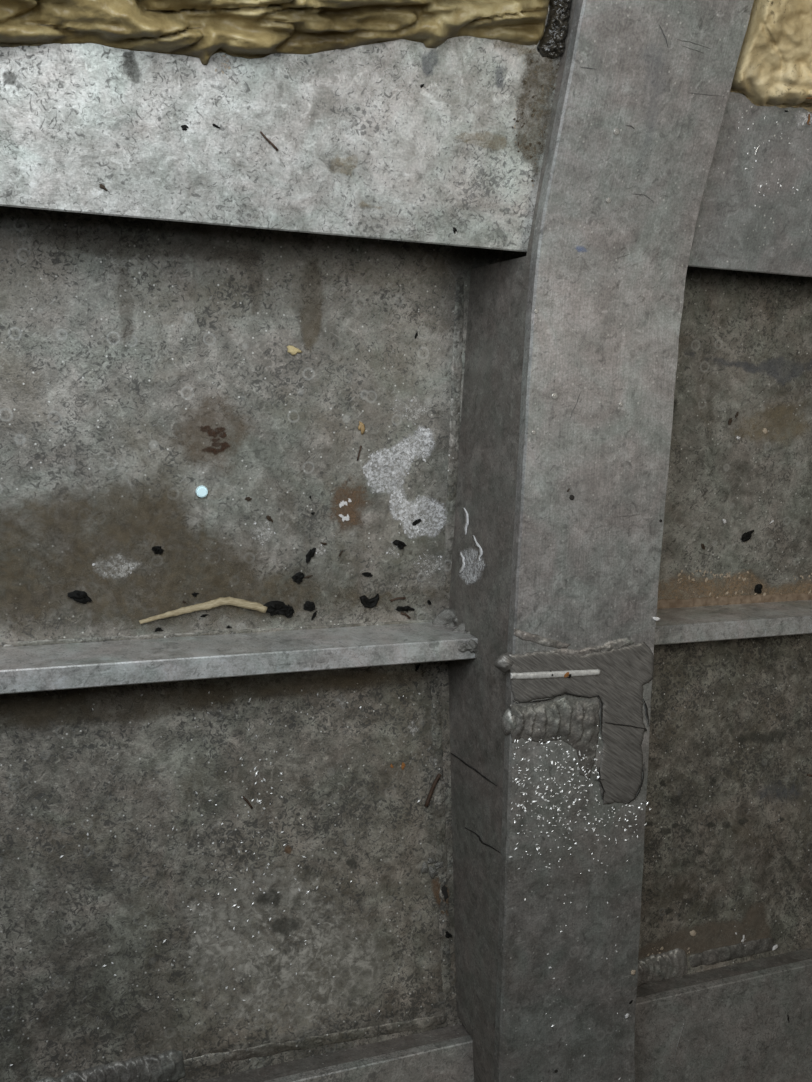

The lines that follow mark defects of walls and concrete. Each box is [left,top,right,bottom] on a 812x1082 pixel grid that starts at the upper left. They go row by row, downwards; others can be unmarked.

corrosion [185,419,245,457]
corrosion [331,398,446,538]
damp [0,492,319,625]
corrosion [459,508,485,583]